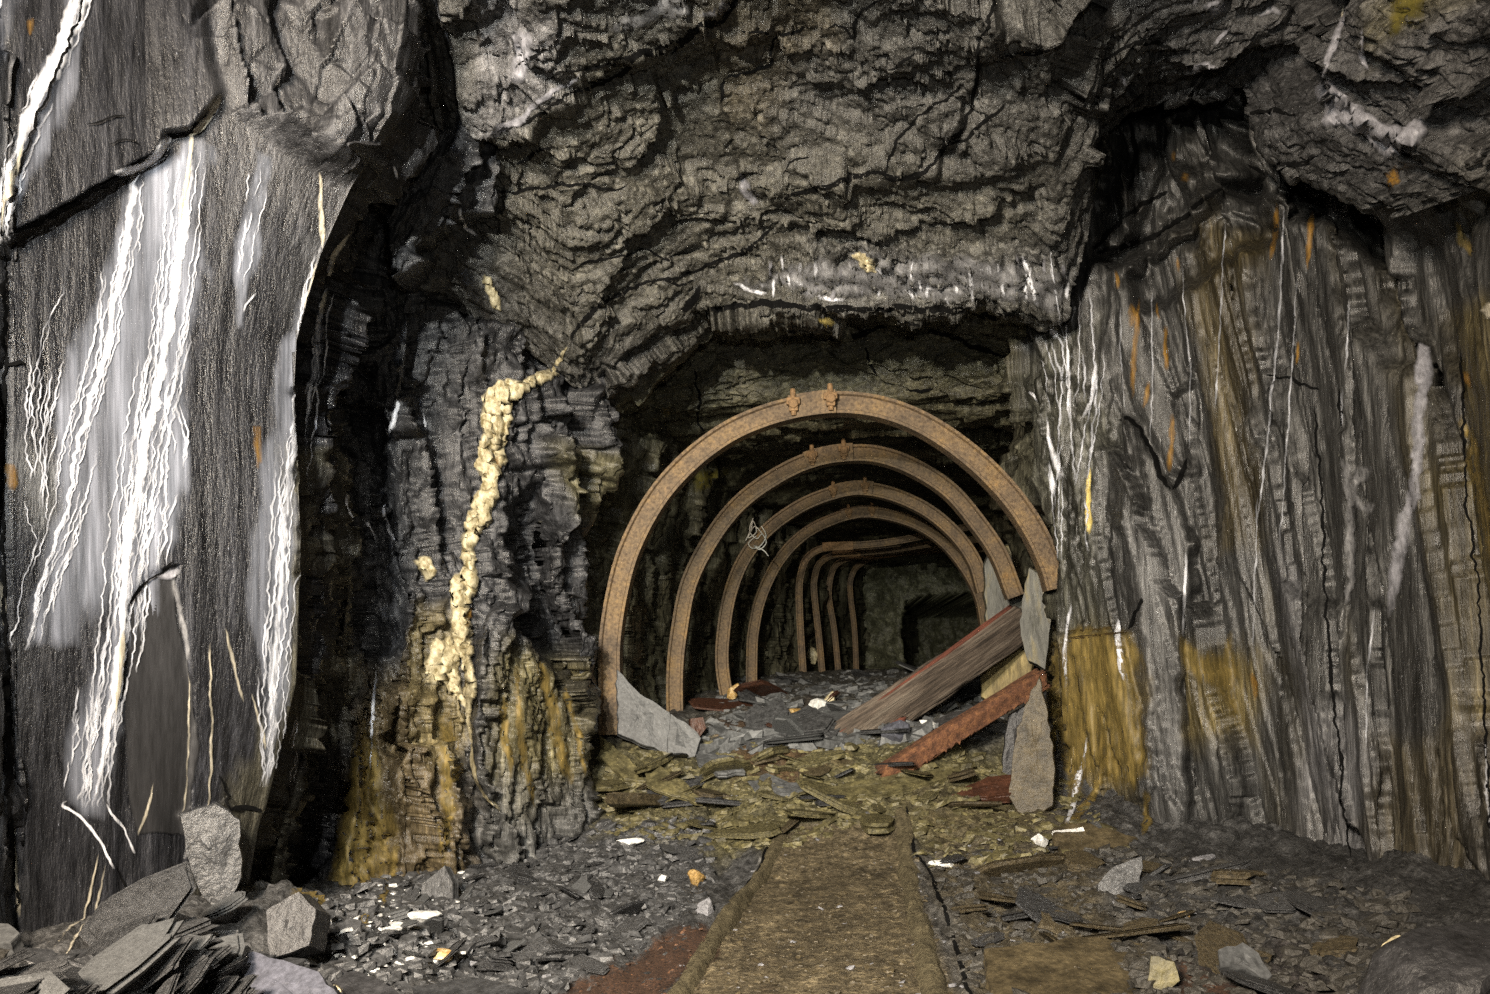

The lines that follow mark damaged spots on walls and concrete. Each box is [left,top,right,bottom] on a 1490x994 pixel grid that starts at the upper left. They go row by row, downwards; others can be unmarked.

crack [15,0,83,175]
water stain [235,172,267,309]
crack [495,0,881,195]
crack [570,0,1064,393]
crack [1104,39,1175,61]
crack [0,96,220,929]
water stain [10,96,221,866]
water stain [253,176,349,780]
water stain [384,400,400,435]
water stain [1388,343,1432,609]
water stain [297,680,398,924]
water stain [1047,609,1152,831]